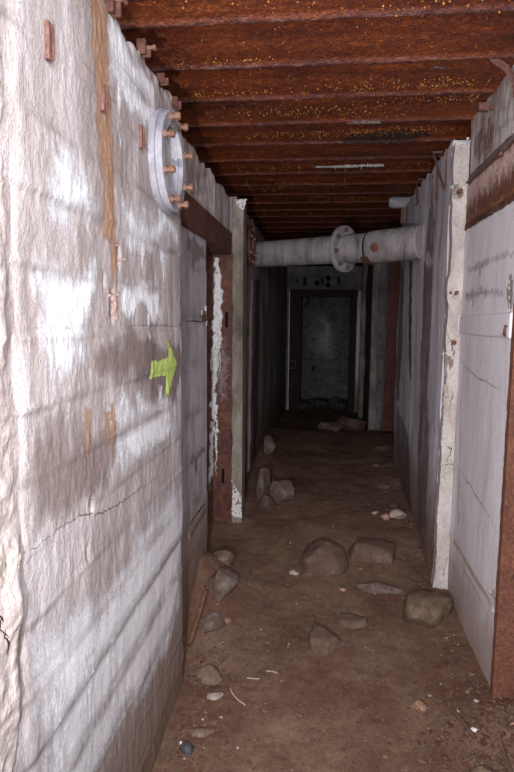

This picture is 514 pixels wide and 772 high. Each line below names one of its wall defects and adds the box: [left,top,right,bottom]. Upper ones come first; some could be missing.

corrosion [92,0,117,292]
leakage [190,257,227,483]
crack [29,478,155,552]